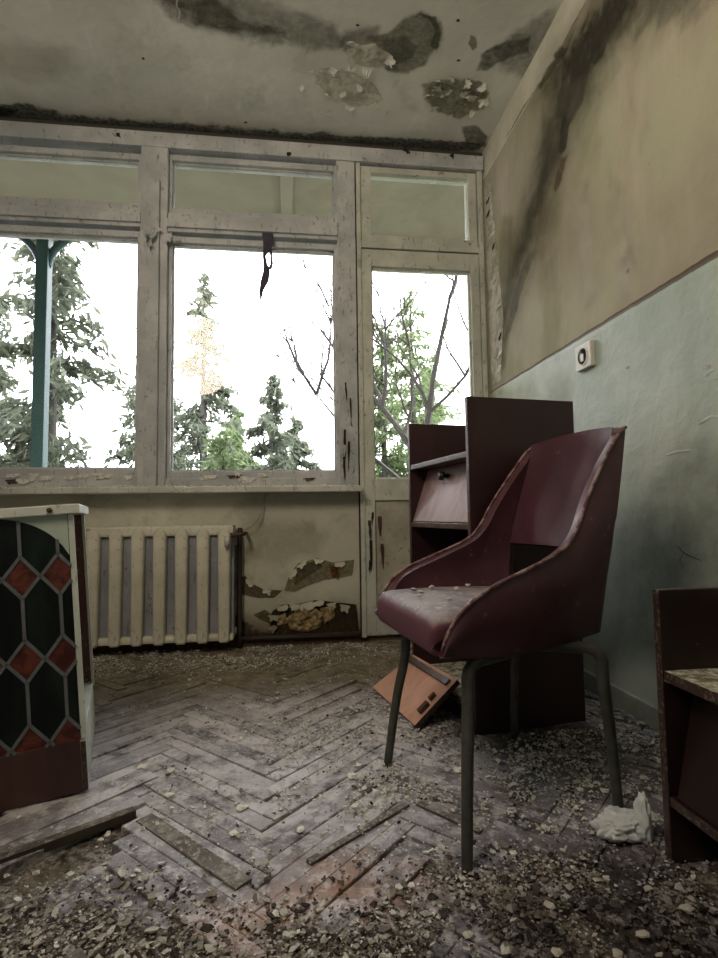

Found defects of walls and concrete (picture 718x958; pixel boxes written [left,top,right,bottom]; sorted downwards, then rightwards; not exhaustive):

peeling [308,41,396,117]
damp [370,13,442,72]
peeling [421,77,490,121]
damp [469,38,530,70]
damp [503,0,636,320]
spalling [236,559,359,634]